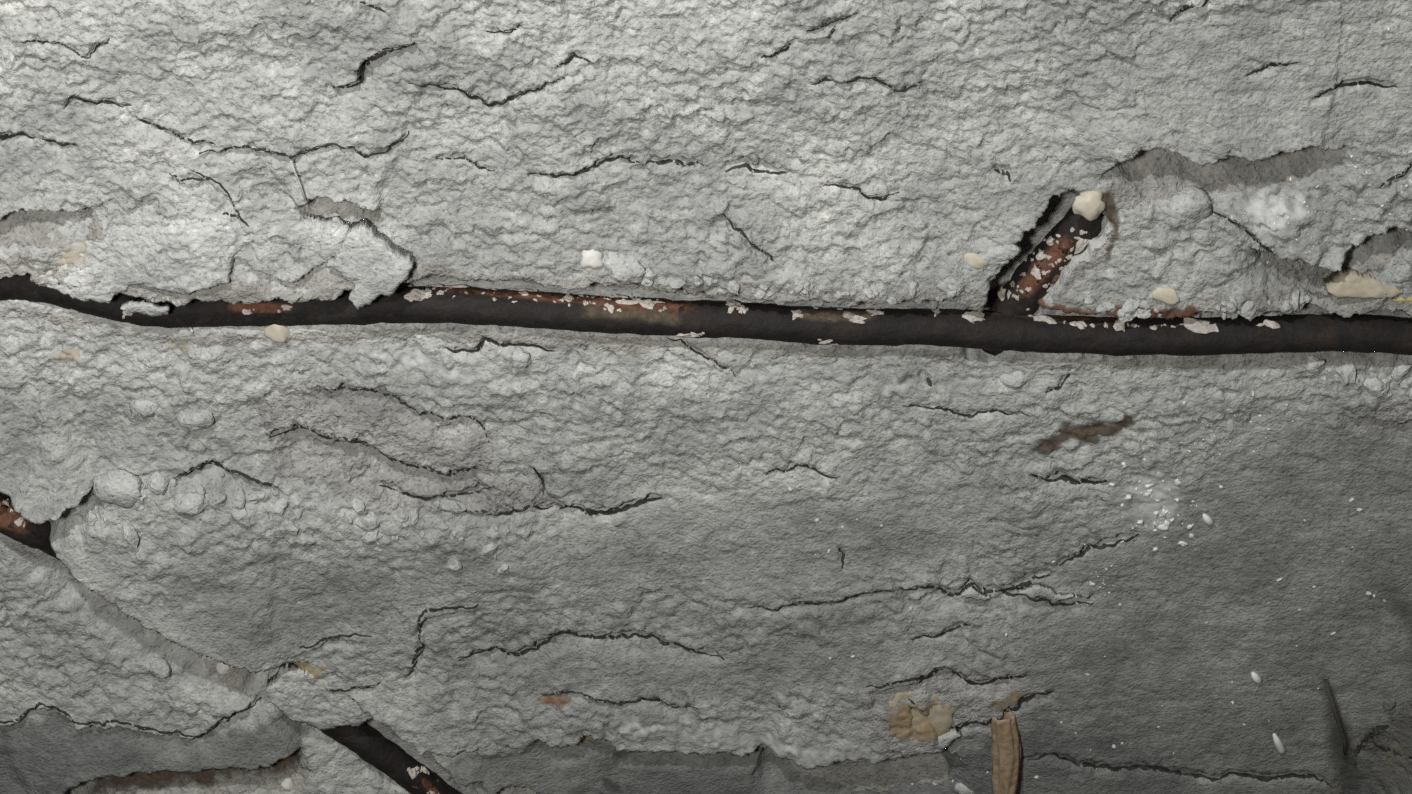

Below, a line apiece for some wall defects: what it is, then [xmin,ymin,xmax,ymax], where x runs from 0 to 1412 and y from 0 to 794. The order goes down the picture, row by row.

peeling [0,197,384,306]
crack [442,337,555,353]
corrosion [431,286,686,325]
corrosion [987,238,1196,326]
corrosion [1102,190,1118,259]
spalling [1007,351,1412,375]
spalling [1047,146,1412,320]
spalling [250,383,571,521]
crack [269,386,662,516]
corrosion [0,502,27,532]
crack [457,631,725,660]
crack [748,533,1139,729]